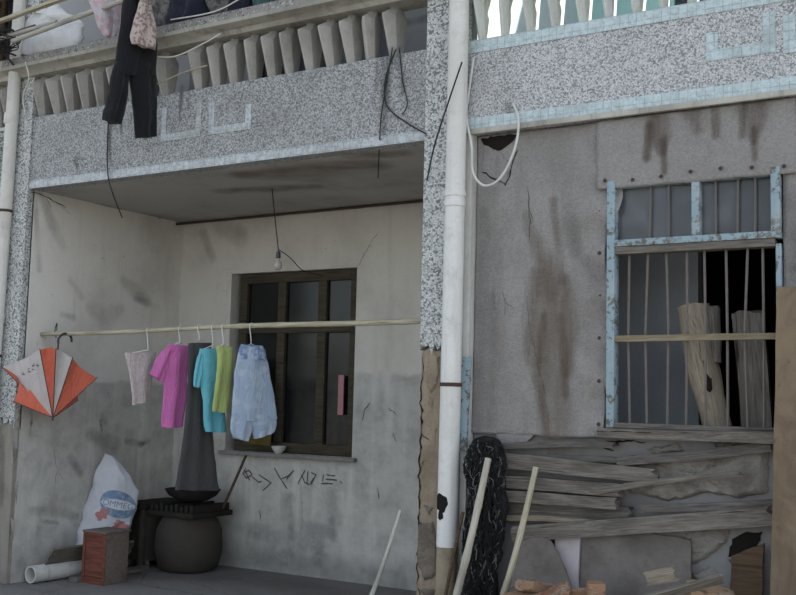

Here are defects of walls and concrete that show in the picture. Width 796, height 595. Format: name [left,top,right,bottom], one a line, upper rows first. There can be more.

peeling [482,145,511,183]